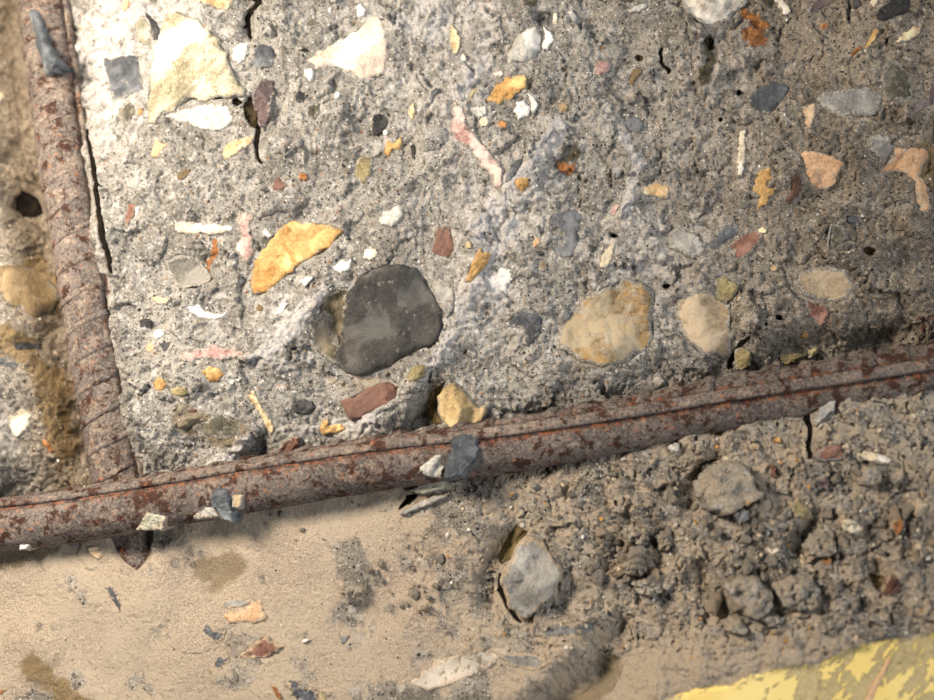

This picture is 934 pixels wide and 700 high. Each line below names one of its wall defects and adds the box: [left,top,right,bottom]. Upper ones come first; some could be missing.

crack [243,0,261,39]
crack [86,129,112,273]
crack [254,127,262,164]
spalling [0,0,934,484]
rust [0,323,79,463]
spalling [0,339,934,700]